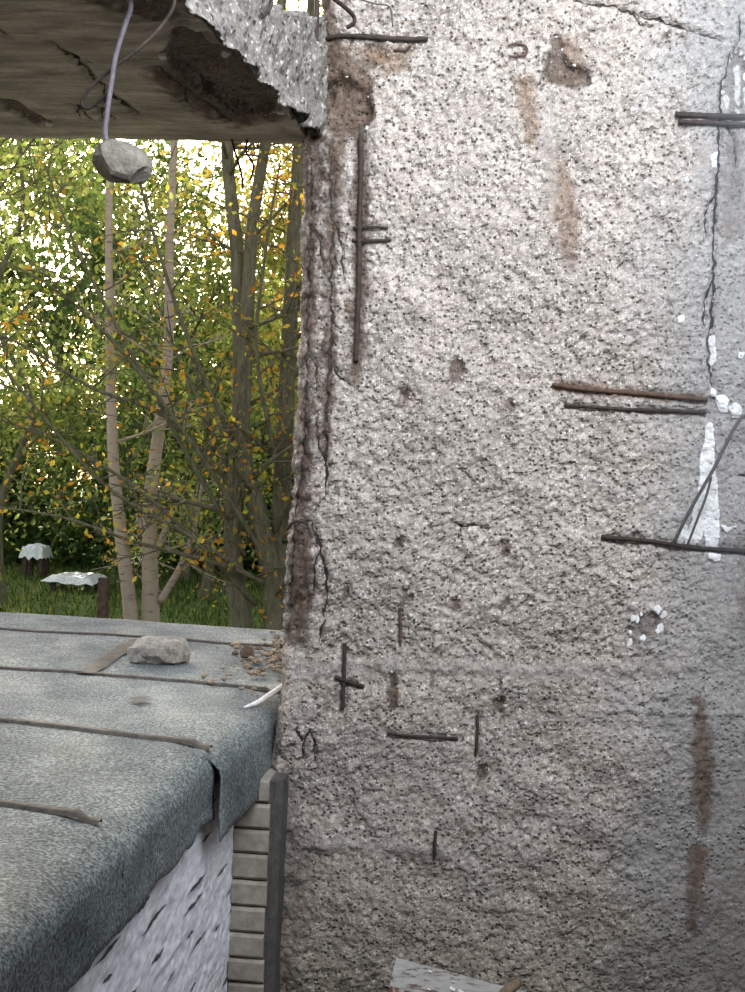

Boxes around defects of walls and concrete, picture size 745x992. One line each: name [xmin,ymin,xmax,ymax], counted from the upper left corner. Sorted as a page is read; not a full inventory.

spalling [158,26,285,115]
rust [550,163,576,258]
crack [576,0,741,394]
crack [288,150,349,641]
spalling [601,535,745,553]
rust [693,696,713,824]
rust [687,845,706,934]